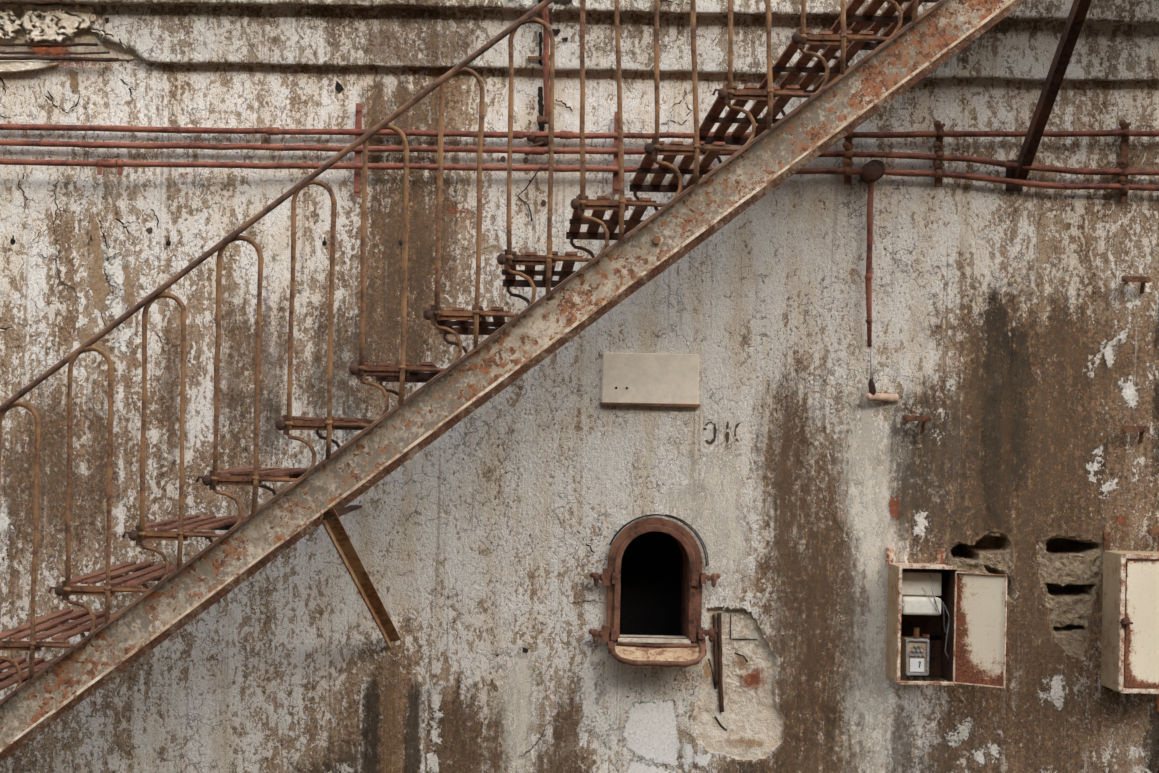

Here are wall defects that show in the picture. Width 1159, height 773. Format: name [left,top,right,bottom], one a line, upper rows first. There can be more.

flaking render [506,0,580,12]
spalling [0,2,141,92]
spalling [538,29,568,66]
corrosion [889,497,907,520]
water stain [664,284,1150,773]
spalling [948,531,1017,604]
spalling [1037,534,1103,660]
spalling [573,605,783,773]
water stain [1132,694,1159,773]